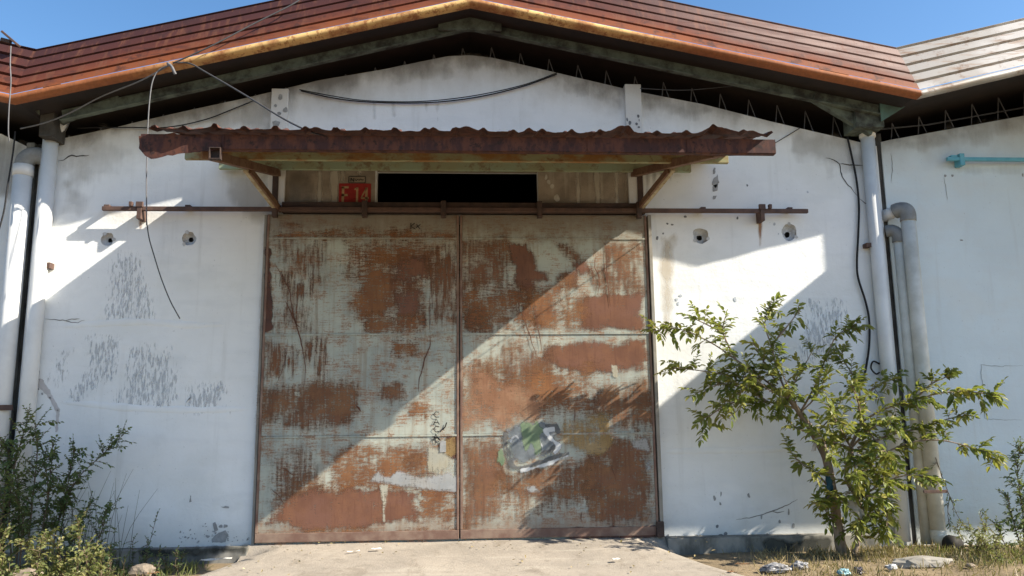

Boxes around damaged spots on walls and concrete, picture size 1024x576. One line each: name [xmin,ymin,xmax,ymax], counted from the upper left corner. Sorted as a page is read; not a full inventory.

corrosion [257,223,656,544]
crack [736,500,796,520]